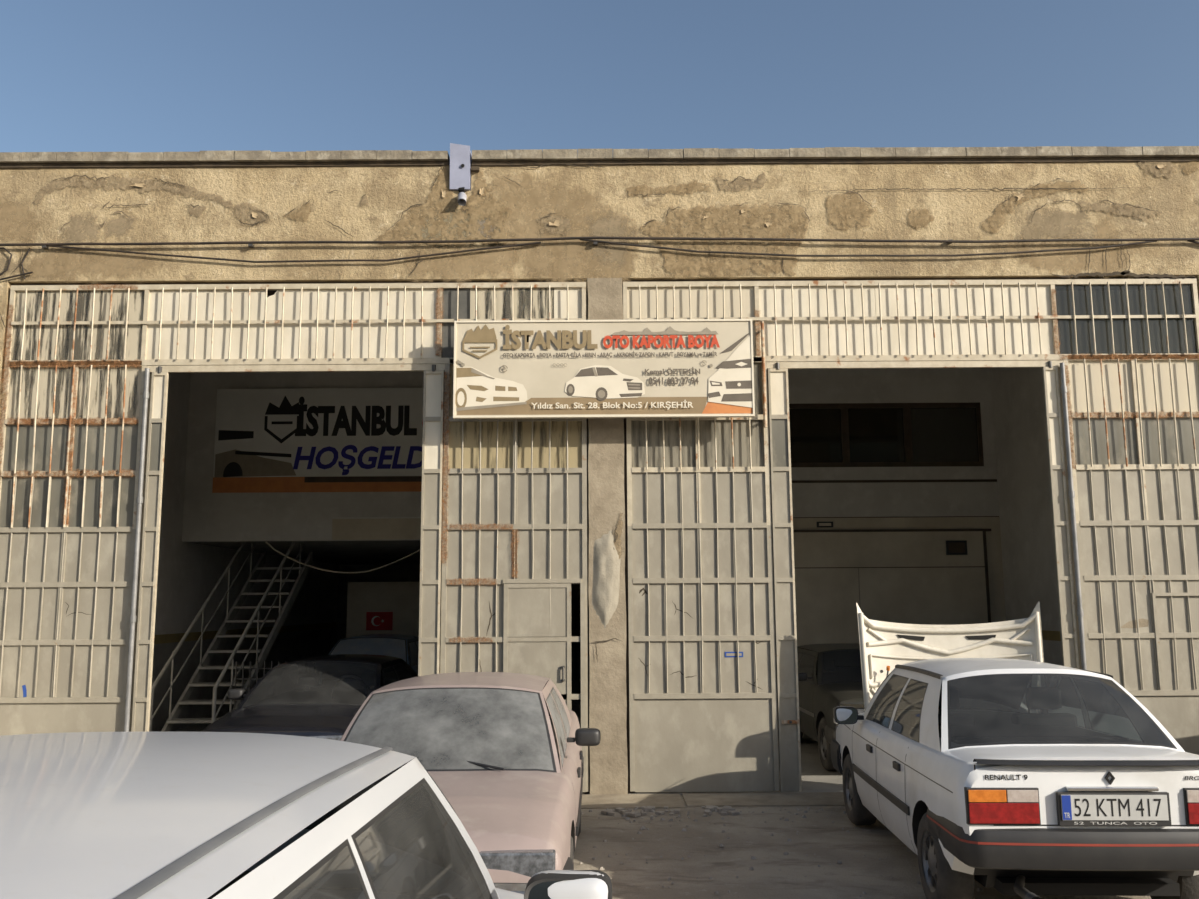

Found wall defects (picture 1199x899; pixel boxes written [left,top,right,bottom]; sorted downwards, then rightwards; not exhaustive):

flaking render [31,174,312,226]
flaking render [627,172,810,278]
flaking render [826,191,875,230]
flaking render [908,209,935,229]
flaking render [981,178,1160,233]
corrosion [0,305,140,524]
crack [592,638,694,678]